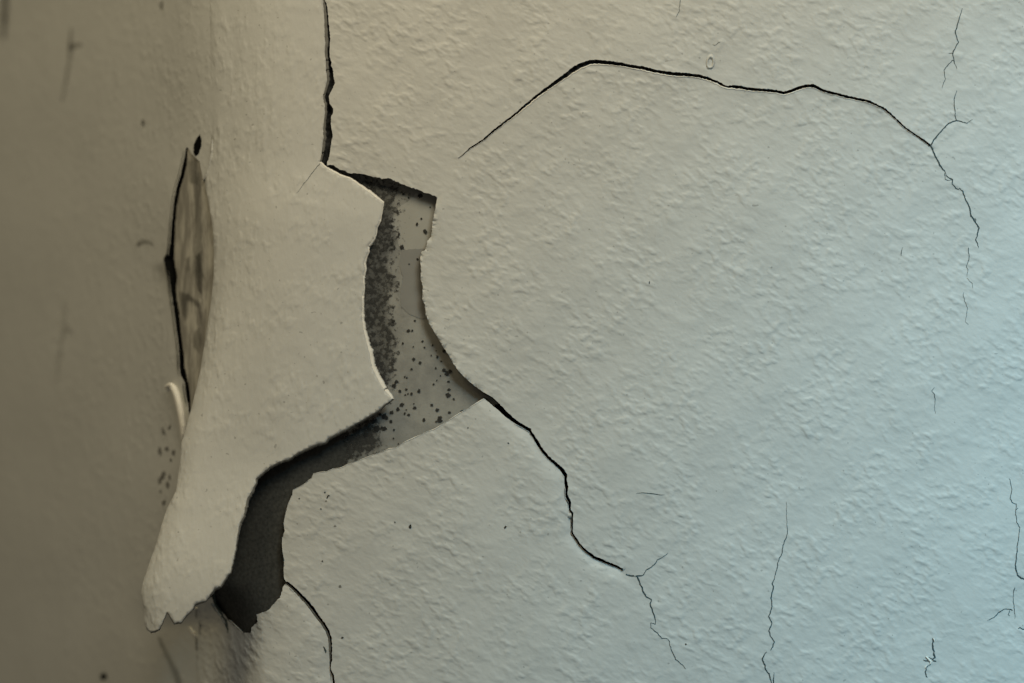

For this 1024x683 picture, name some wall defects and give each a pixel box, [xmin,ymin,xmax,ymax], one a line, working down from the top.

crack [321,3,335,163]
crack [460,10,980,321]
peeling [141,0,498,636]
crack [284,582,335,683]
crack [484,393,686,669]